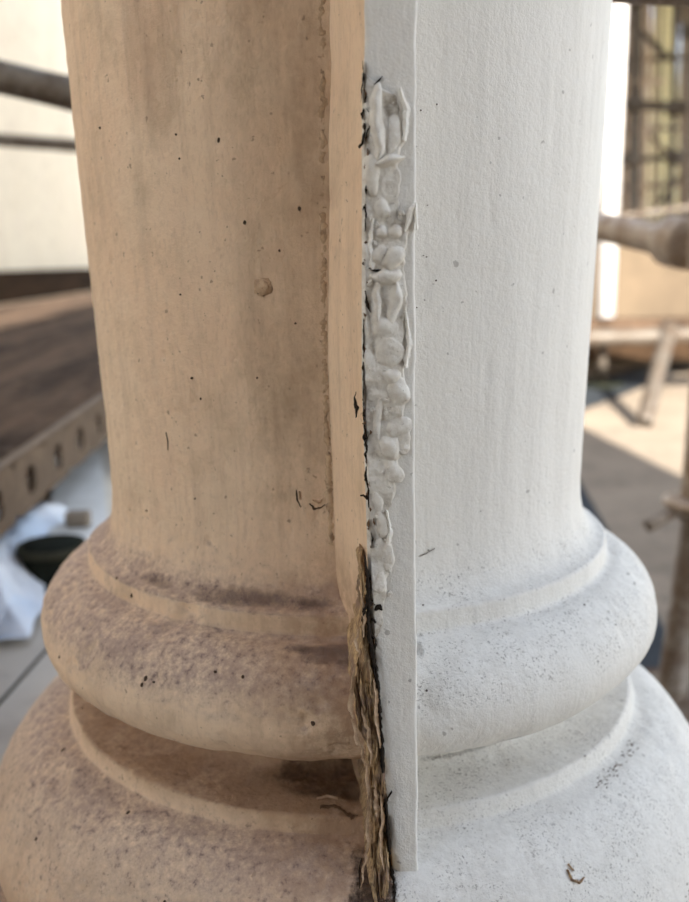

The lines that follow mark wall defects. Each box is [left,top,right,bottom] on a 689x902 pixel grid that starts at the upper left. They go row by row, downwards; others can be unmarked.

flaking render [317,73,428,902]
crack [354,64,397,902]